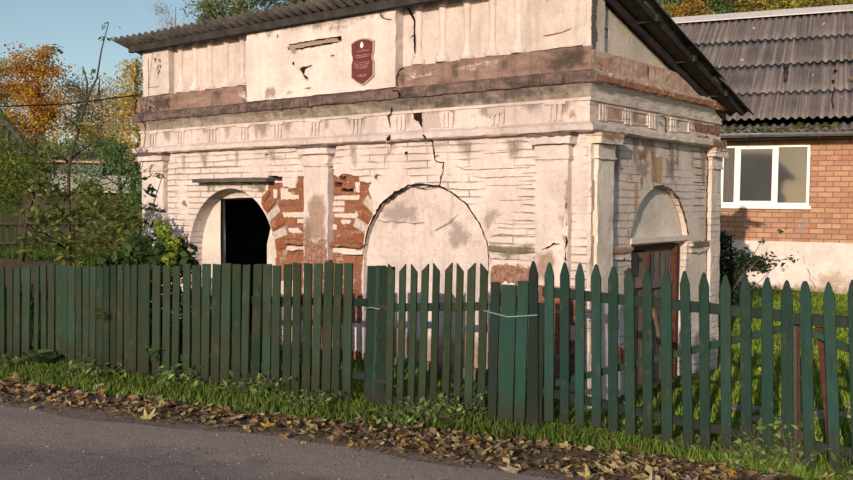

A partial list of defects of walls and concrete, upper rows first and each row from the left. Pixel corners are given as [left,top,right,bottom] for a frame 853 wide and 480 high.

spalling [288,36,342,89]
crack [380,7,416,164]
spalling [261,174,377,323]
crack [364,134,568,275]
peeling [614,149,663,239]